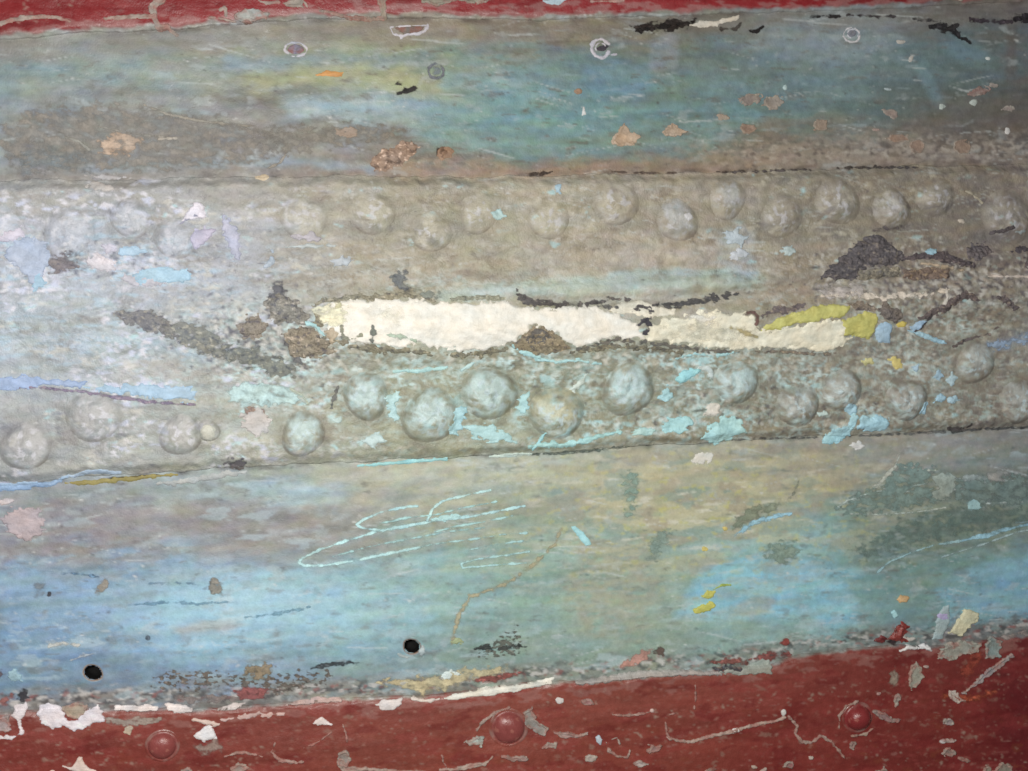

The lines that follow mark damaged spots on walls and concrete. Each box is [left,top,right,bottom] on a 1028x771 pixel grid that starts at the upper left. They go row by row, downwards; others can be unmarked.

peeling [208,0,308,25]
peeling [967,83,998,106]
peeling [816,225,1028,344]
spalling [236,291,739,402]
peeling [375,666,555,710]
peeling [575,658,773,686]
peeling [849,605,1028,750]
peeling [0,687,342,771]
peeling [464,706,510,748]
peeling [523,707,662,768]
peeling [939,718,970,763]
peeling [983,762,1013,771]